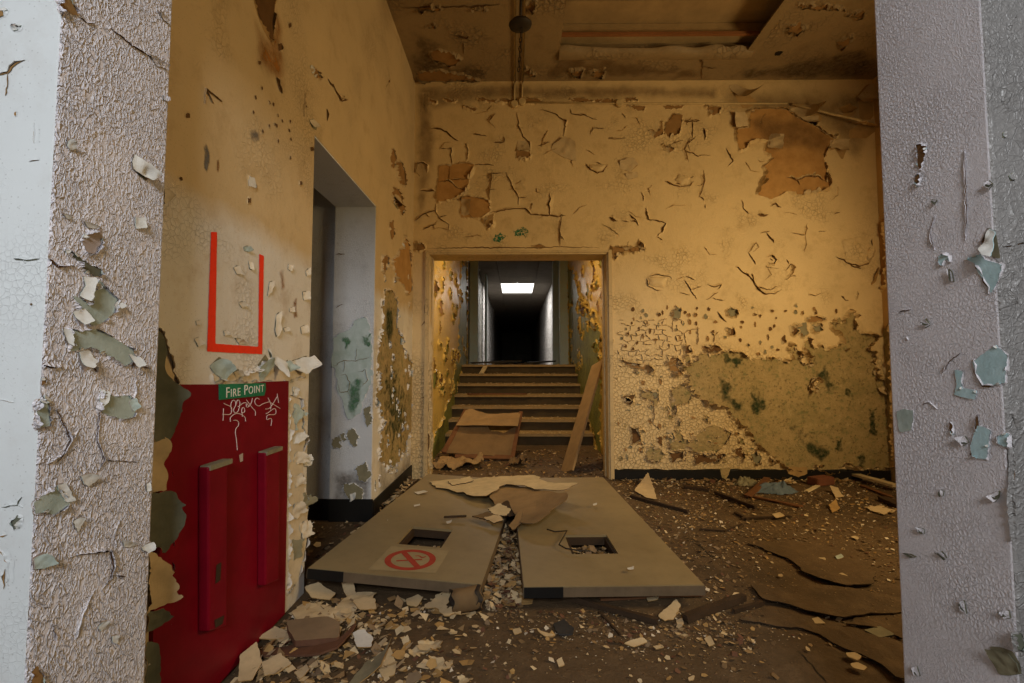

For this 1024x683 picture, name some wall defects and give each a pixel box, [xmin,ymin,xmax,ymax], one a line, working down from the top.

peeling [703,84,879,201]
peeling [32,376,52,431]
peeling [9,483,86,533]
peeling [61,212,191,683]
peeling [209,147,427,610]
peeling [433,261,469,458]
crack [414,105,764,469]
crack [616,172,840,367]
peeling [567,240,915,499]
leakage [721,380,765,413]
leakage [807,440,842,460]
peeling [965,228,1006,294]